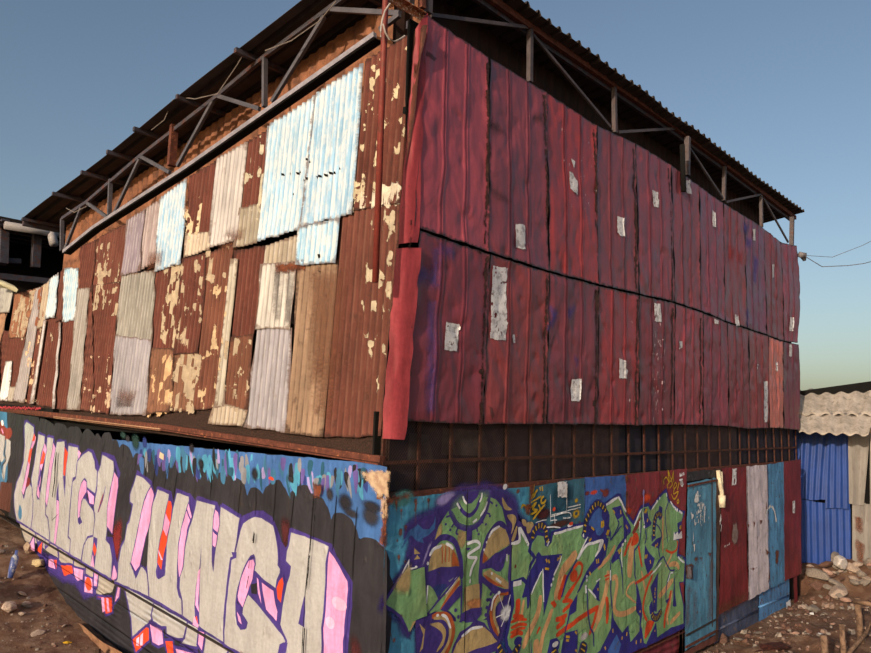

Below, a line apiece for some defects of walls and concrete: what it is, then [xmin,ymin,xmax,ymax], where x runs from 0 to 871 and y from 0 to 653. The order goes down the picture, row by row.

peeling [363,59,380,131]
peeling [184,203,202,243]
corrosion [275,260,306,273]
peeling [352,174,402,319]
peeling [147,250,251,418]
peeling [364,334,386,358]
corrosion [379,494,430,548]